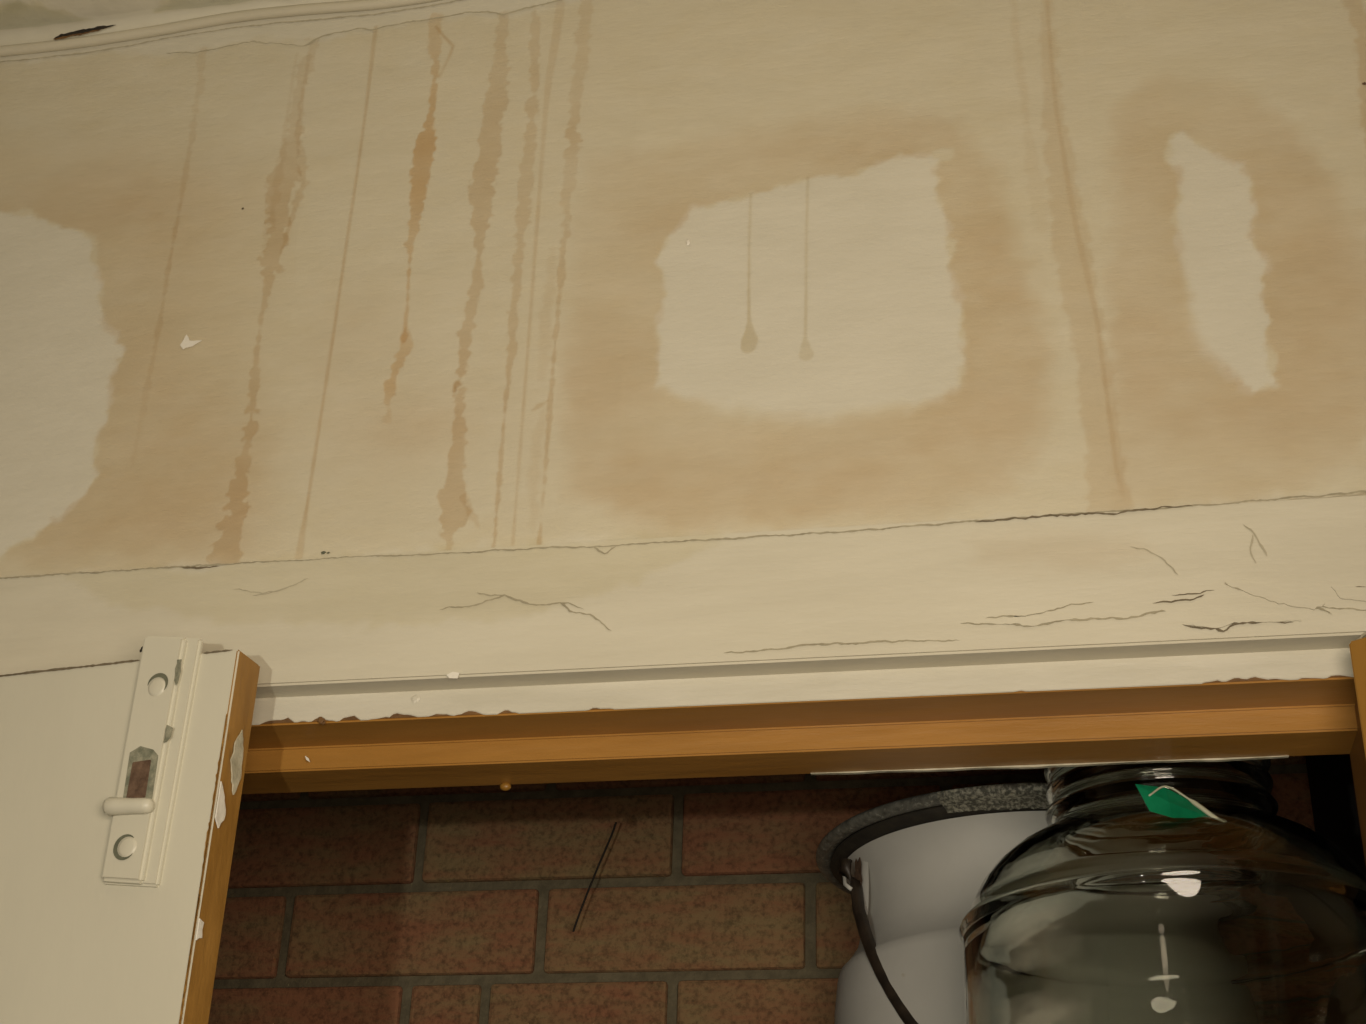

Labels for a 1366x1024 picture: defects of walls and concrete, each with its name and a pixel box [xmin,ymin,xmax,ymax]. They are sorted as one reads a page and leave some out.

crack [0,490,1366,653]